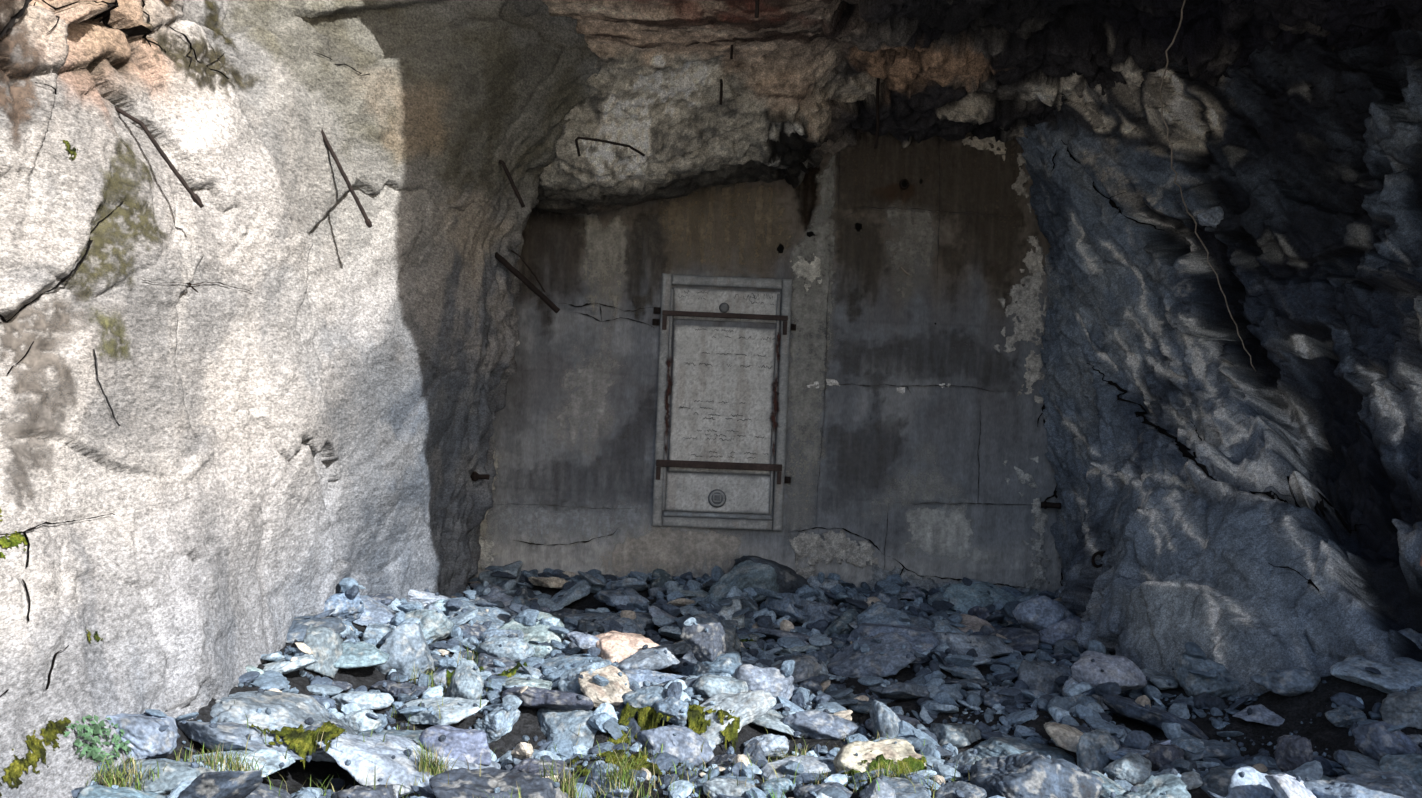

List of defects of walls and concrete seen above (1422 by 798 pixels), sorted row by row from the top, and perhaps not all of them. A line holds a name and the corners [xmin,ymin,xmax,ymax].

crack [553,301,654,328]
water stain [521,132,1027,562]
peeling [993,236,1047,403]
corrosion [664,359,673,452]
corrosion [769,378,779,456]
crack [494,504,631,545]
spalling [789,530,879,579]